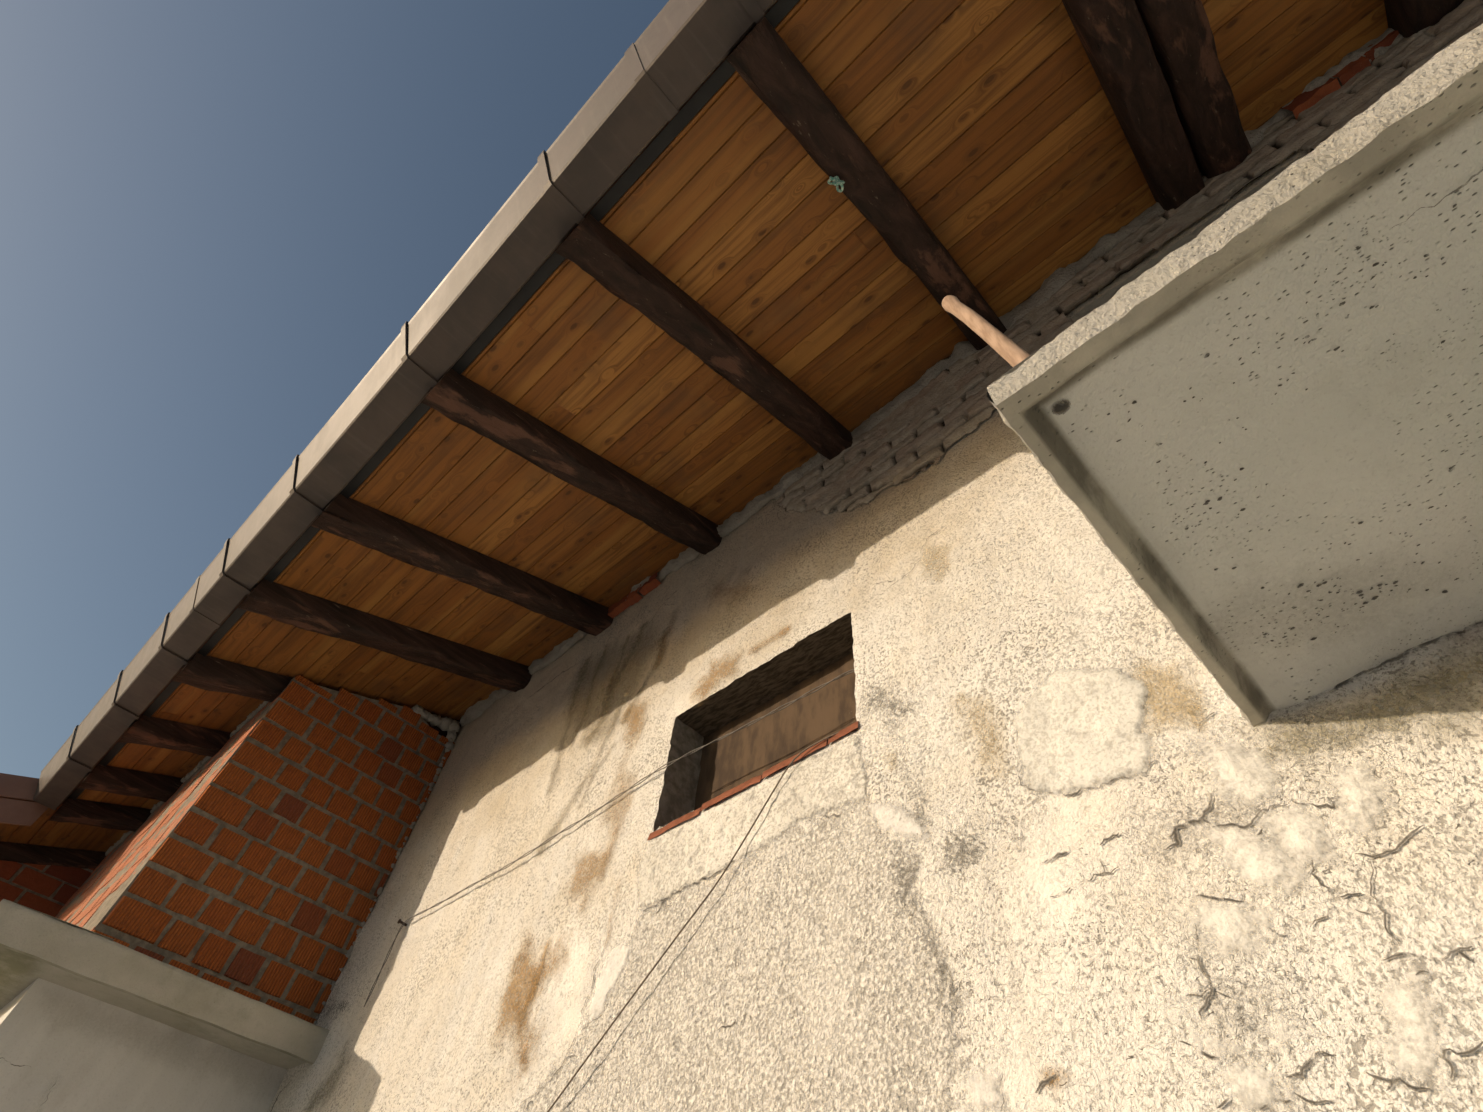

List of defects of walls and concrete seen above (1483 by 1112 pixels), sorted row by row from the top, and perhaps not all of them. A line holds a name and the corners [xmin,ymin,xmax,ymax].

crack [1392,169,1483,228]
crack [1163,795,1342,850]
crack [1042,833,1119,897]
crack [1285,825,1473,975]
crack [1179,894,1244,1059]
crack [1217,1051,1333,1110]
crack [1366,1041,1483,1091]